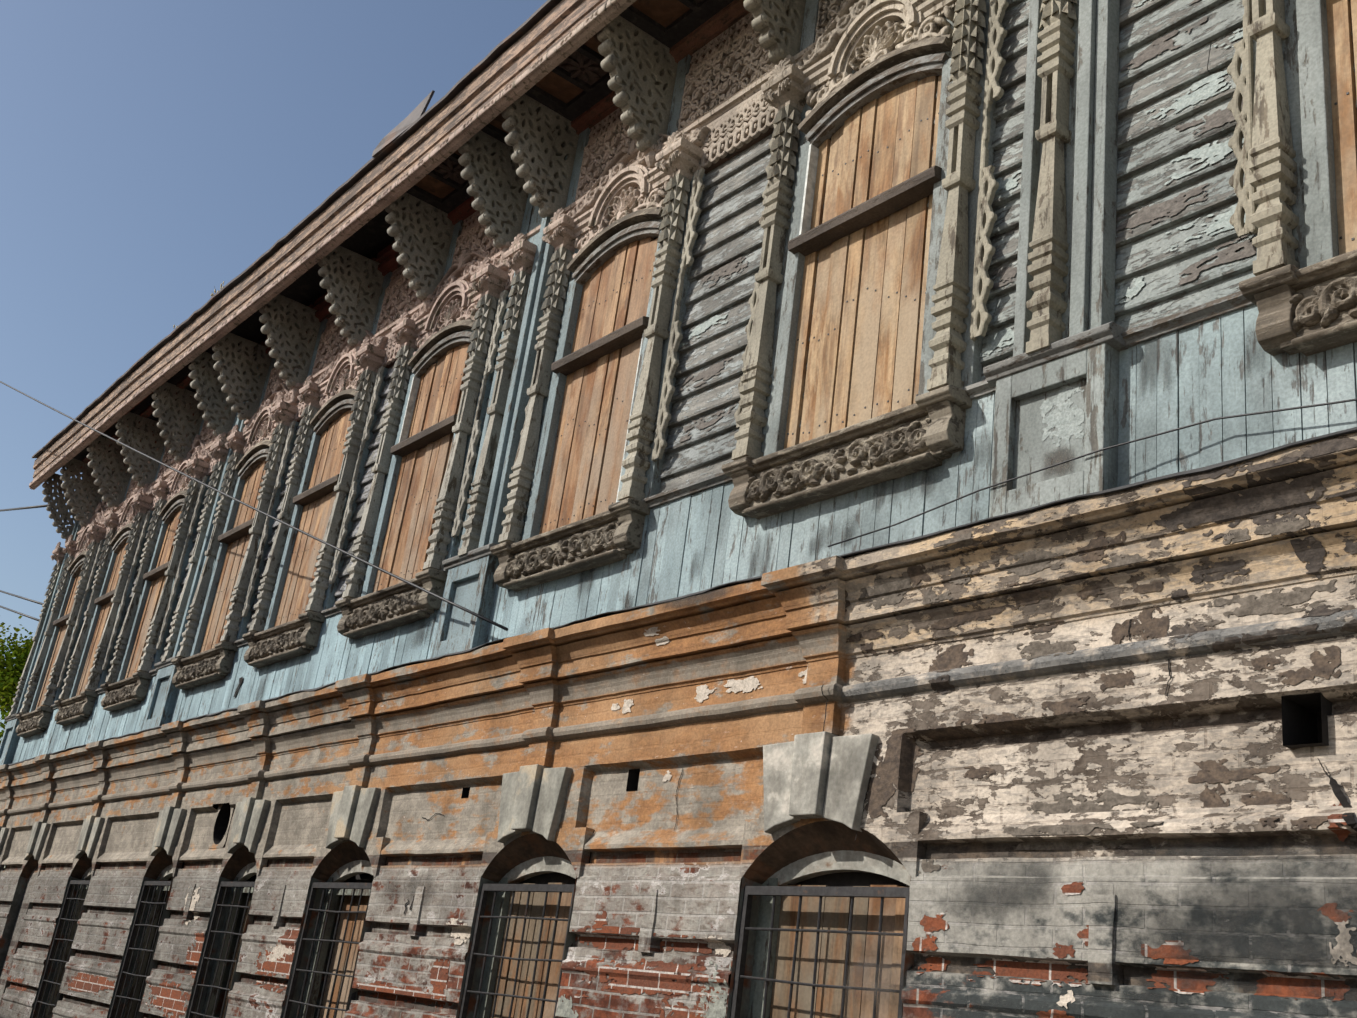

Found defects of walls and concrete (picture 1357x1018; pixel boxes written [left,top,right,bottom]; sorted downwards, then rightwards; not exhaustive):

peeling [1145,70,1230,121]
peeling [845,438,1357,685]
peeling [694,676,763,703]
peeling [928,643,974,694]
peeling [862,670,1135,818]
peeling [1002,790,1164,850]
peeling [1188,759,1340,835]
crack [1317,758,1357,842]
flaking render [254,927,300,993]
flaking render [572,910,731,1018]
flaking render [967,925,1089,1018]
flaking render [1254,903,1357,1001]